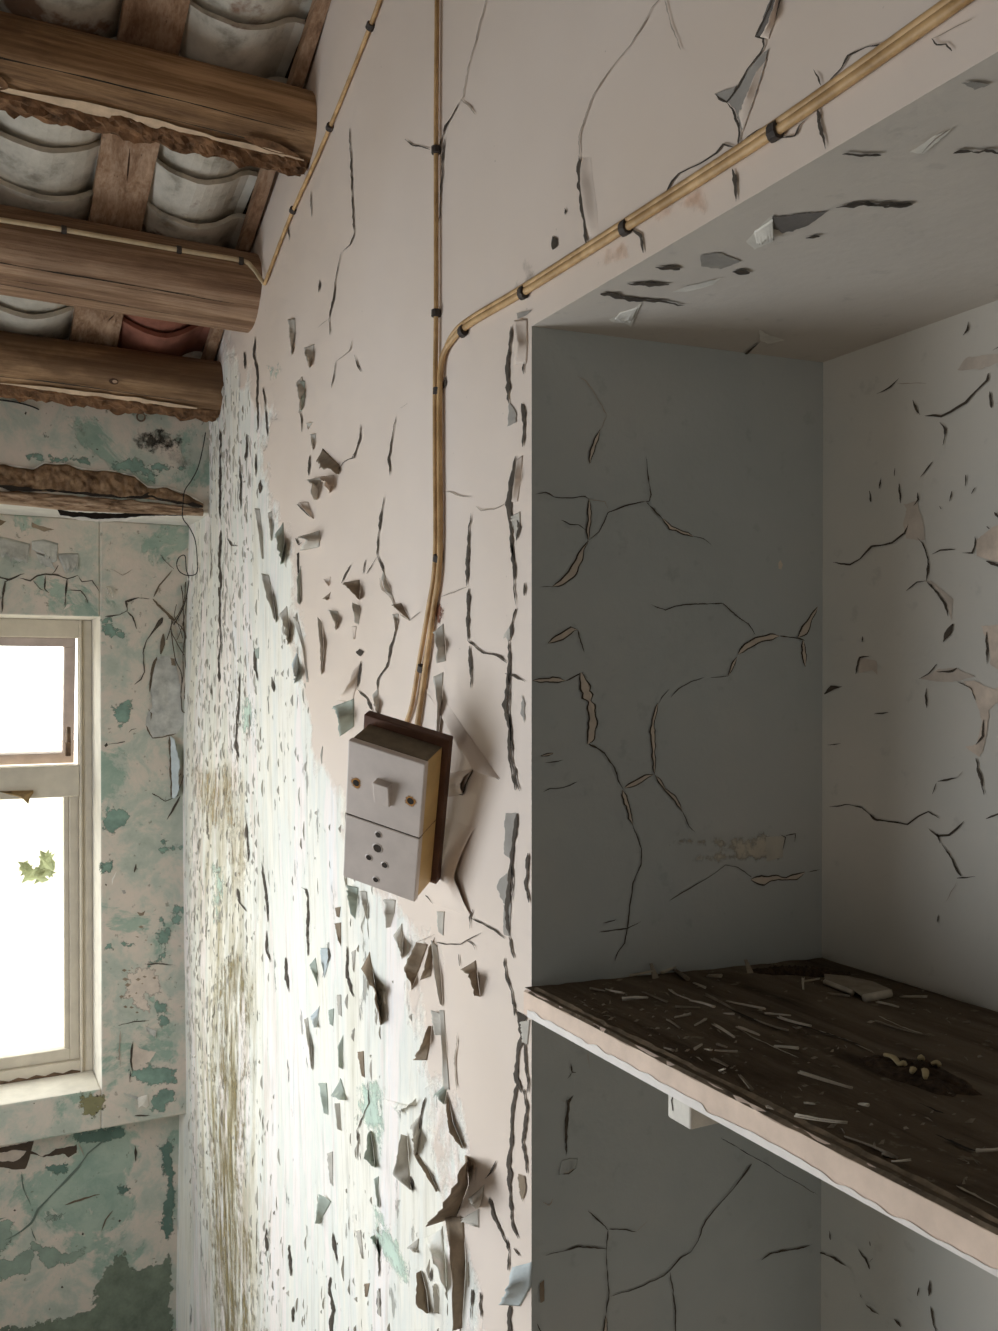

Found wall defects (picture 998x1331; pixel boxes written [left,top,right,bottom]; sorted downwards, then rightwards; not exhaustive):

crack [576,0,681,243]
crack [0,557,174,629]
flaking render [0,429,238,681]
mould [134,429,182,451]
peeling [239,318,420,737]
peeling [441,310,531,791]
crack [834,347,998,679]
crack [533,603,818,960]
crack [831,759,998,922]
mould [78,1092,106,1119]
peeling [301,813,544,1331]
peeling [0,1138,176,1331]